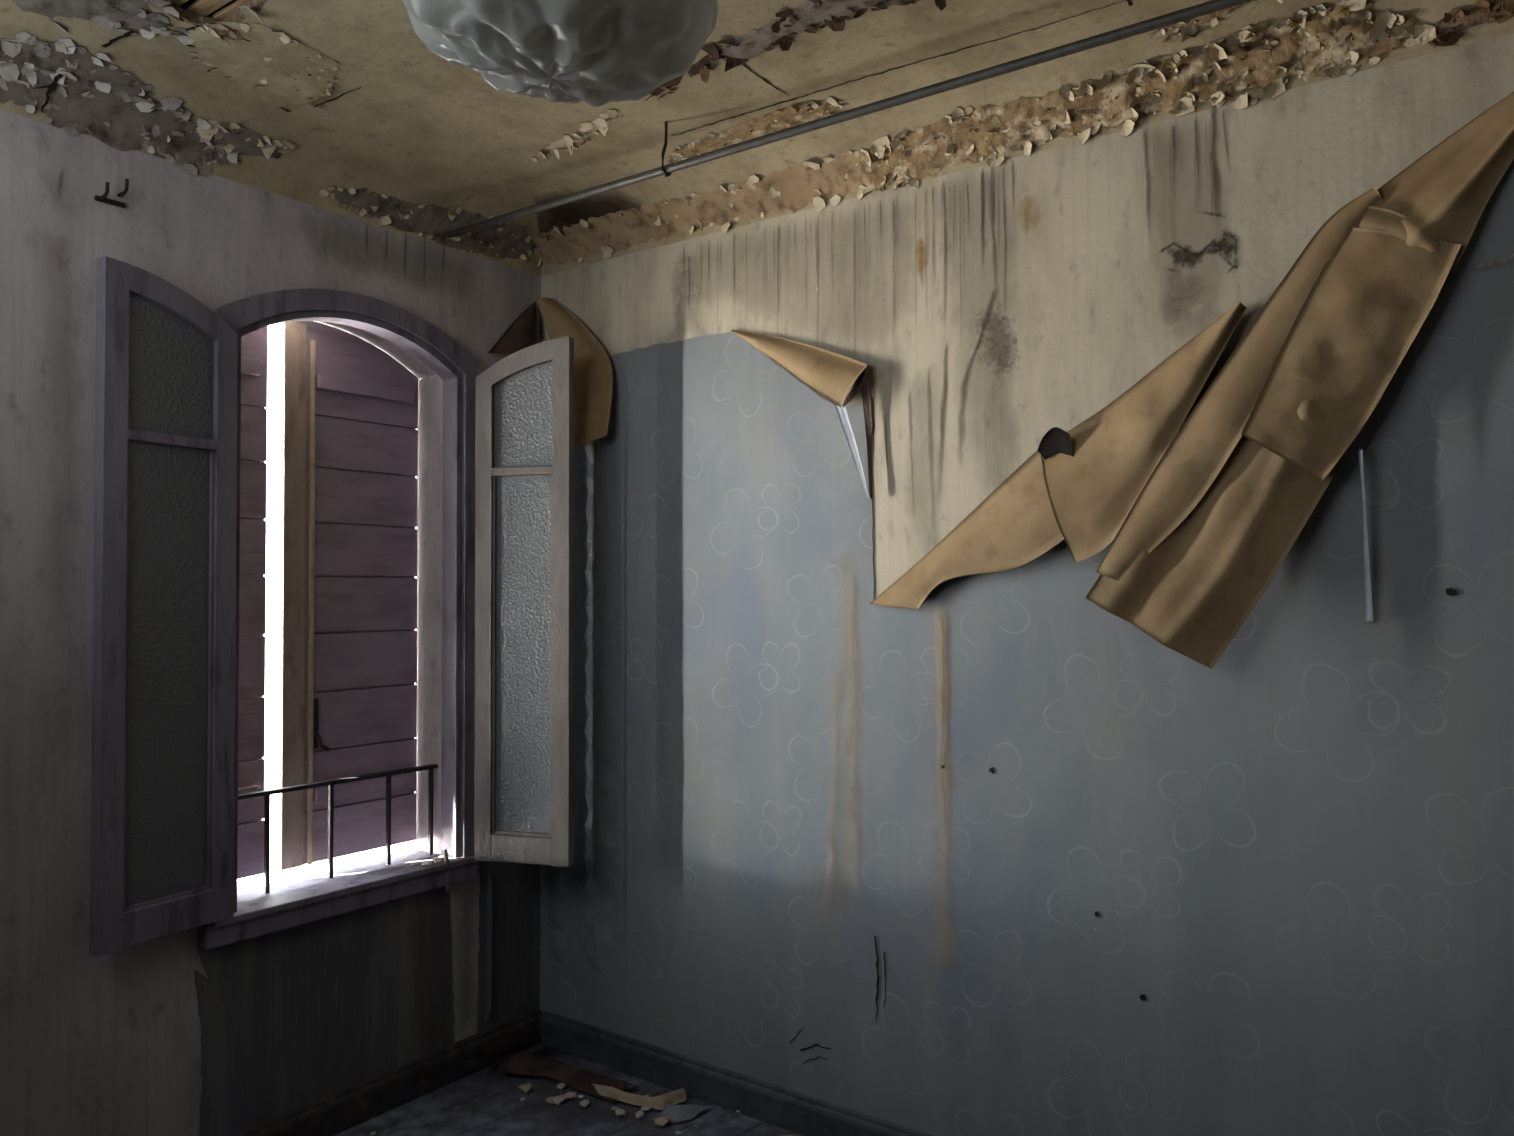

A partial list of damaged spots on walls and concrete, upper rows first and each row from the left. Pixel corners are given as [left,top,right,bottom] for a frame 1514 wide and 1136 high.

peeling [0,0,340,177]
peeling [319,0,1514,266]
damp [967,165,1013,254]
damp [941,298,993,431]